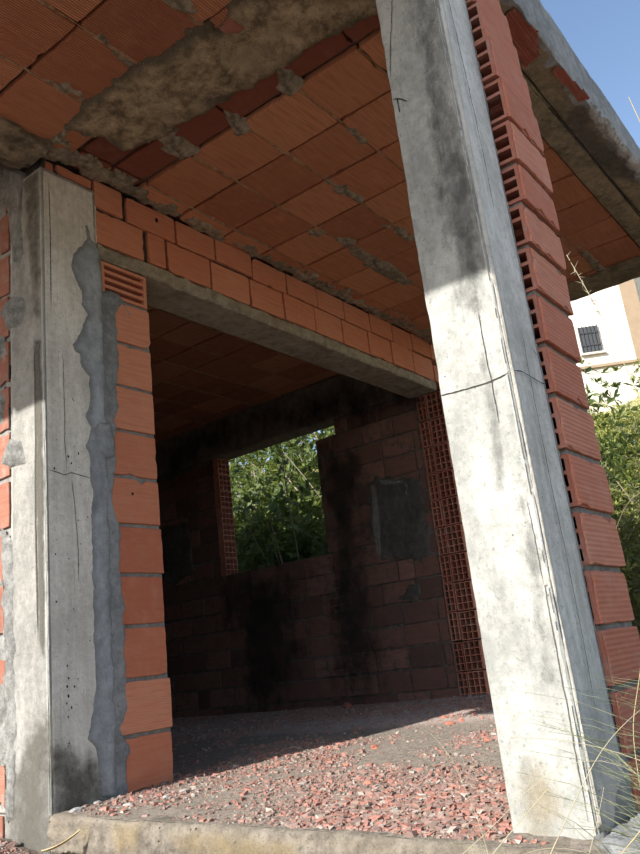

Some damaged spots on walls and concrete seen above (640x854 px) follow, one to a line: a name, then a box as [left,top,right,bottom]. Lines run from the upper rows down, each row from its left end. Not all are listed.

crack [34,352,89,640]
crack [440,313,597,715]
leakage [11,722,103,854]